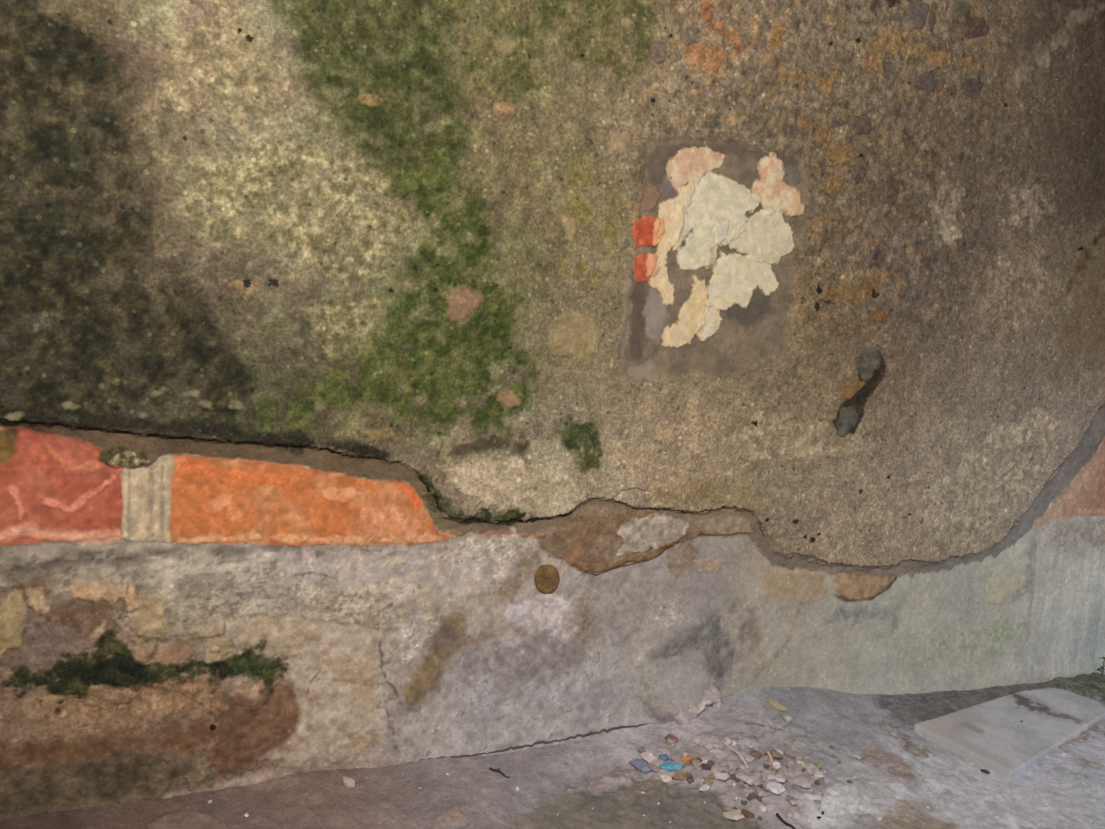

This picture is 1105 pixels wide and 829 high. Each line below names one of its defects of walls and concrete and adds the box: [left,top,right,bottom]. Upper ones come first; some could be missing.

leakage [0,0,422,513]
leakage [0,482,604,821]
crack [110,570,653,760]
crack [0,418,1083,644]
spalling [438,501,754,581]